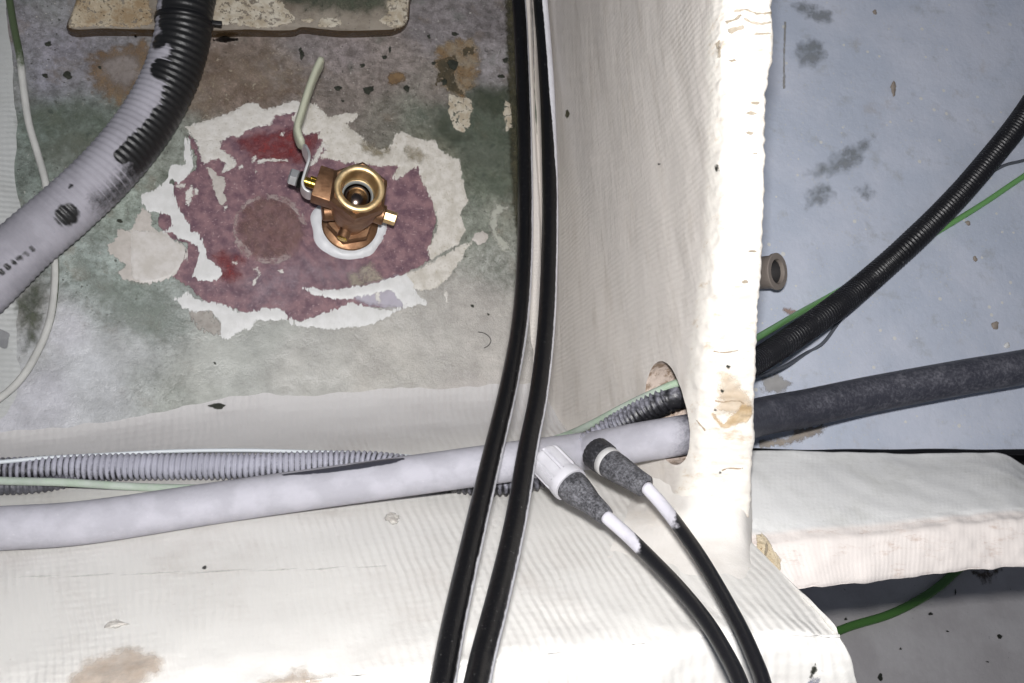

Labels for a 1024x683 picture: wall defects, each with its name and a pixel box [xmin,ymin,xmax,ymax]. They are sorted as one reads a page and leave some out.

leakage [798,5,831,20]
rust [434,38,479,98]
leakage [799,41,821,63]
peeling [432,60,473,132]
leakage [821,143,867,173]
rust [713,374,752,428]